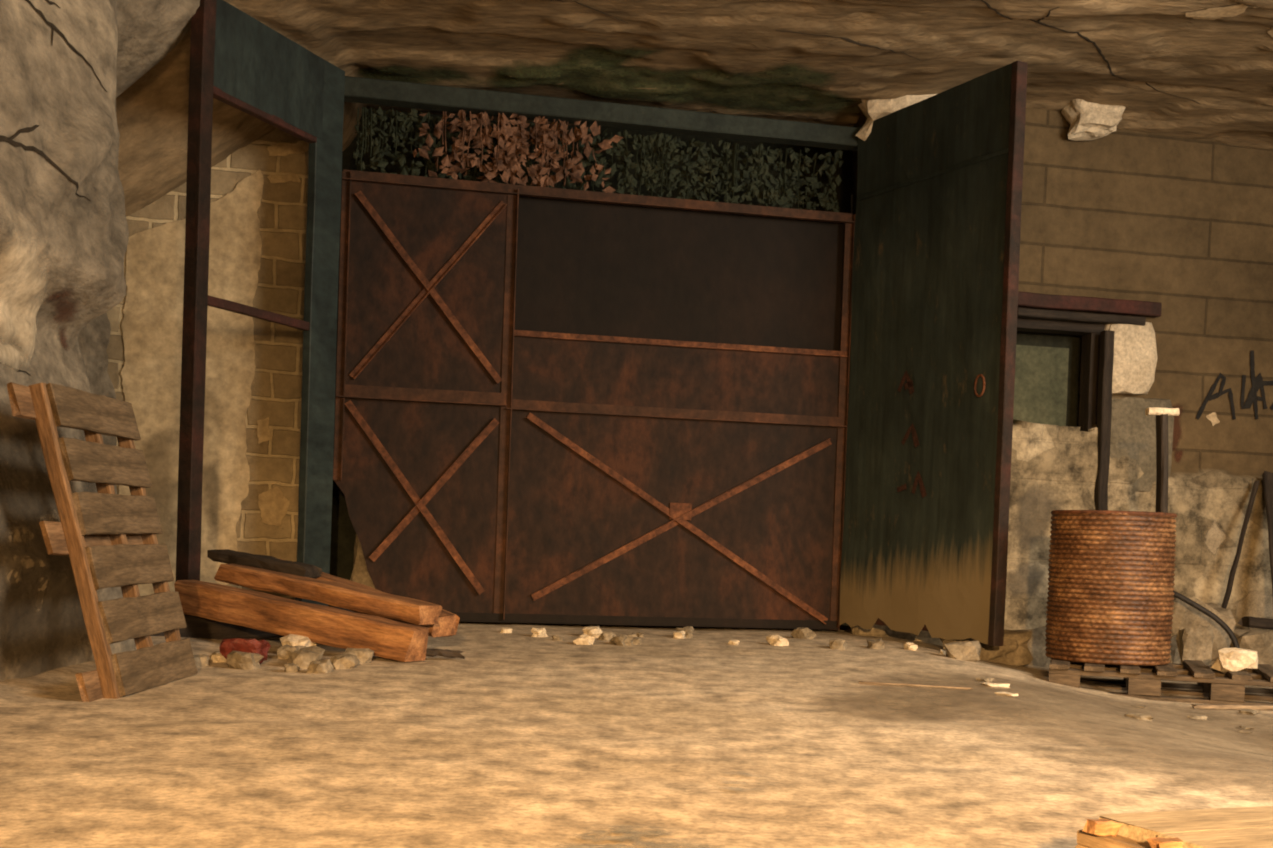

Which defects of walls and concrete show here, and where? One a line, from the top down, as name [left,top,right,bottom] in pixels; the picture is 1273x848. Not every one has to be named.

crack [26,0,107,92]
crack [776,30,919,60]
crack [973,0,1199,104]
spalling [1185,4,1259,20]
crack [0,125,90,201]